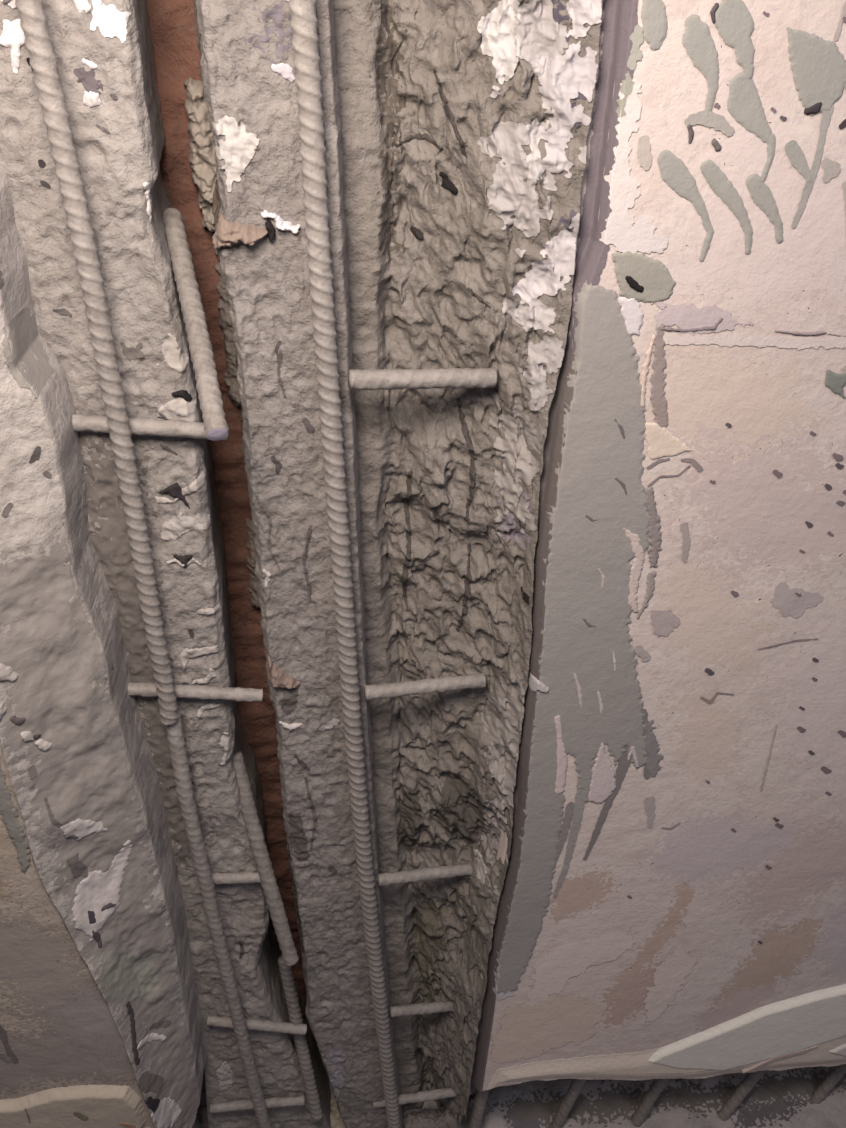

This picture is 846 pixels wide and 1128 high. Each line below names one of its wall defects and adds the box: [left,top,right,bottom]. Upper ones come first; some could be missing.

spalling [0,0,25,74]
spalling [72,0,131,43]
spalling [271,63,295,82]
spalling [212,116,260,192]
spalling [439,172,458,195]
spalling [261,210,301,242]
spalling [477,0,603,549]
spalling [156,333,189,372]
spalling [157,390,199,422]
spalling [155,471,211,540]
spalling [473,670,526,899]
peeling [72,840,133,941]